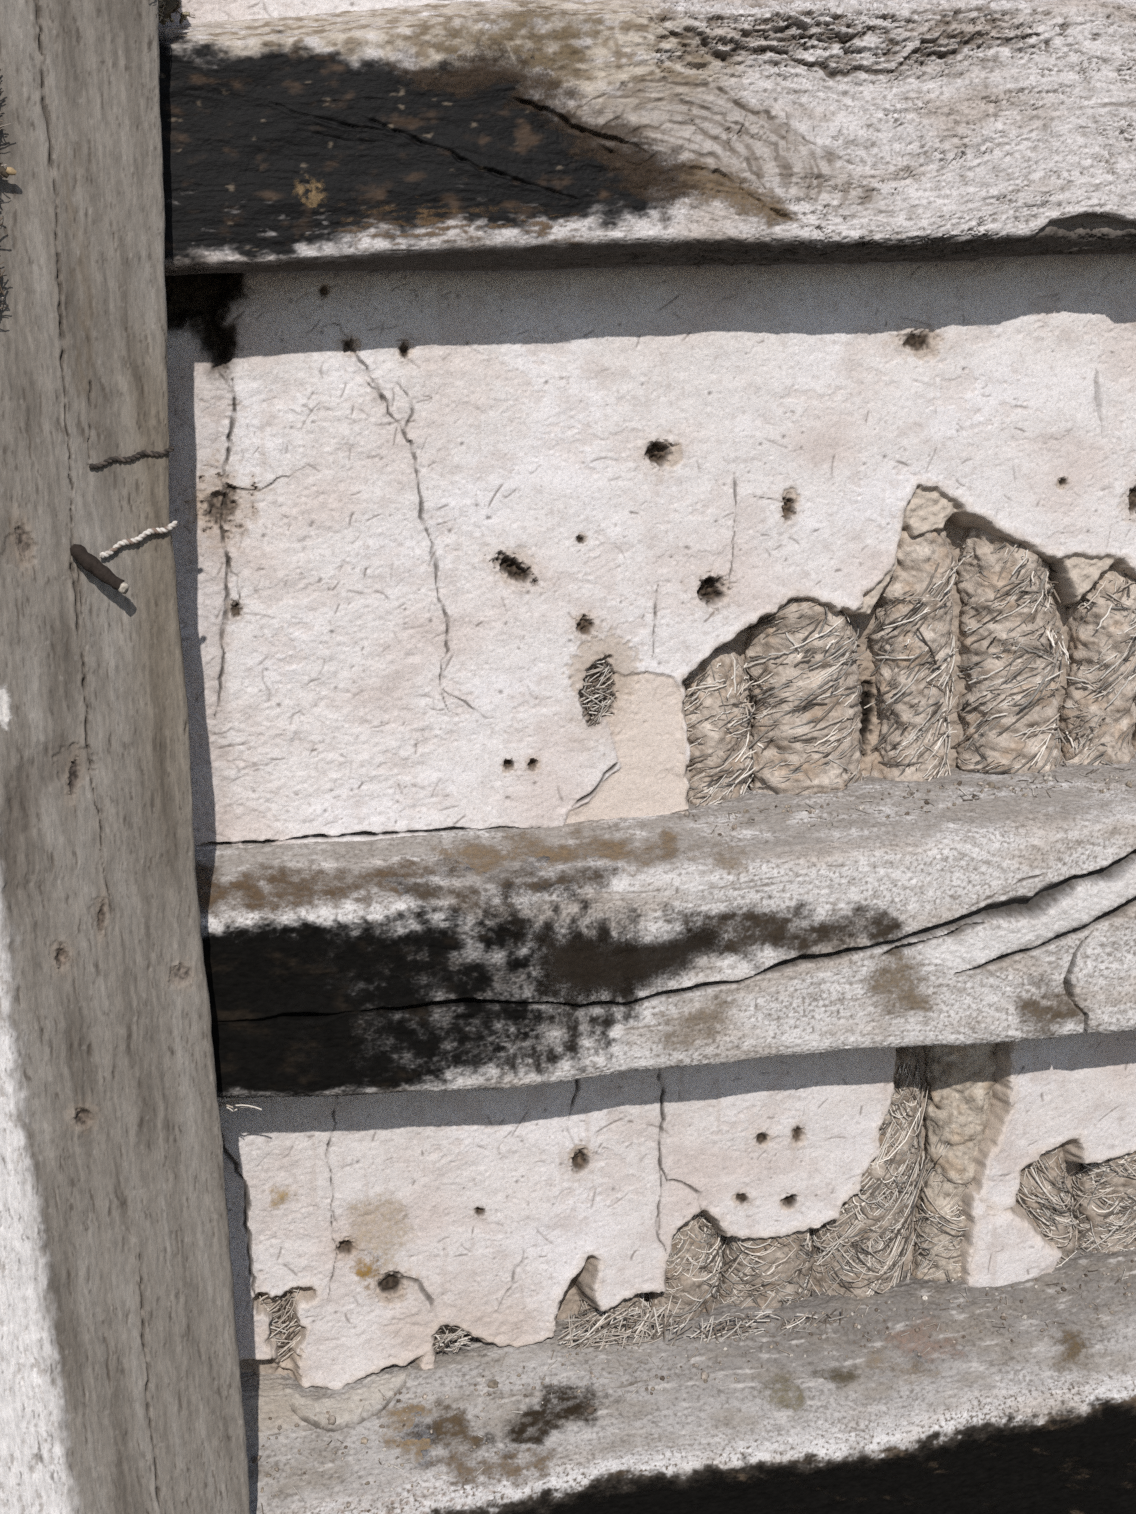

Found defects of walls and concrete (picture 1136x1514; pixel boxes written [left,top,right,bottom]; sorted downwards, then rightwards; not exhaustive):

leakage [159,9,796,265]
crack [213,358,306,719]
crack [332,321,494,719]
flaking render [559,484,1136,825]
crack [195,760,619,847]
leakage [195,830,929,1098]
crack [533,849,1136,1033]
crack [221,1129,411,1455]
flaking render [239,1254,844,1390]
flaking render [675,1170,867,1251]
flaking render [903,1046,928,1271]
flaking render [959,1041,1106,1288]